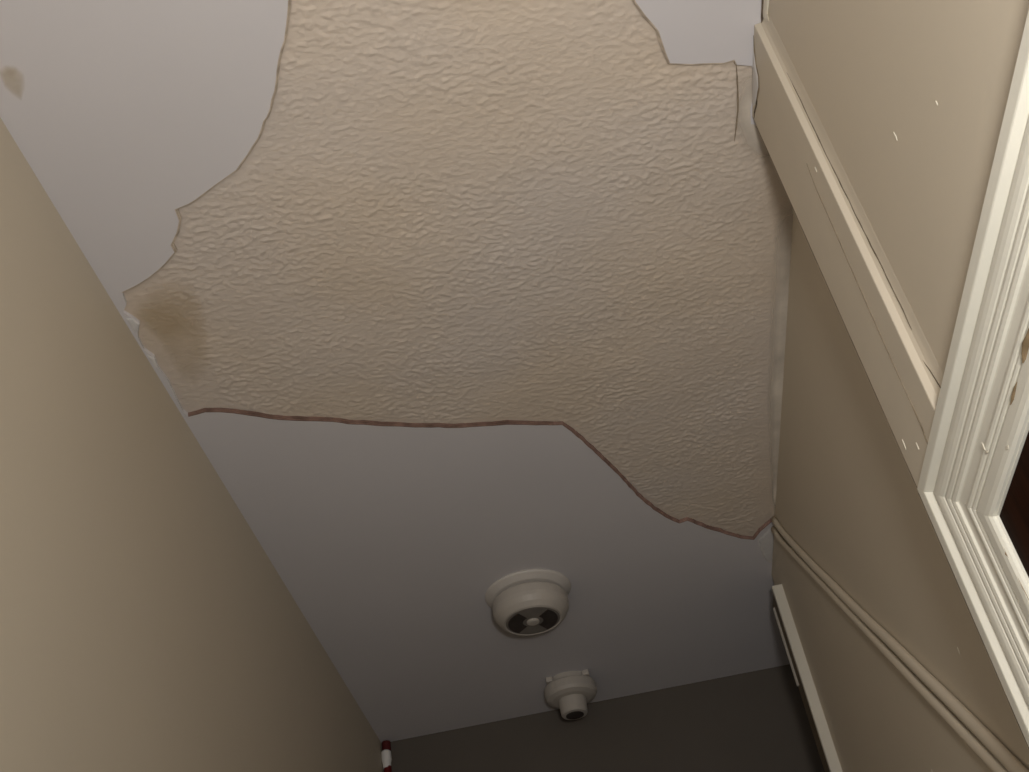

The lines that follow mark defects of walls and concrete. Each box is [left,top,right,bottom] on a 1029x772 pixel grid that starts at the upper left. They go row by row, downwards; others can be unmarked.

peeling [122,0,793,540]
spalling [1021,329,1029,363]